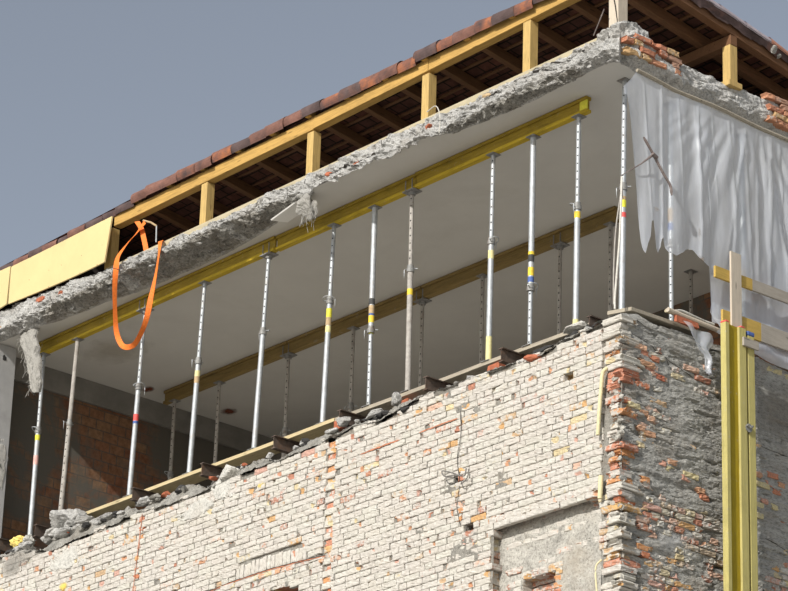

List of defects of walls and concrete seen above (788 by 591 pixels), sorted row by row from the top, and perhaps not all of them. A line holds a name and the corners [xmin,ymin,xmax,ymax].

flaking render [621,33,683,76]
spalling [425,68,583,137]
flaking render [760,92,788,132]
flaking render [635,343,666,382]
flaking render [626,401,656,438]
flaking render [0,439,8,490]
flaking render [659,458,710,502]